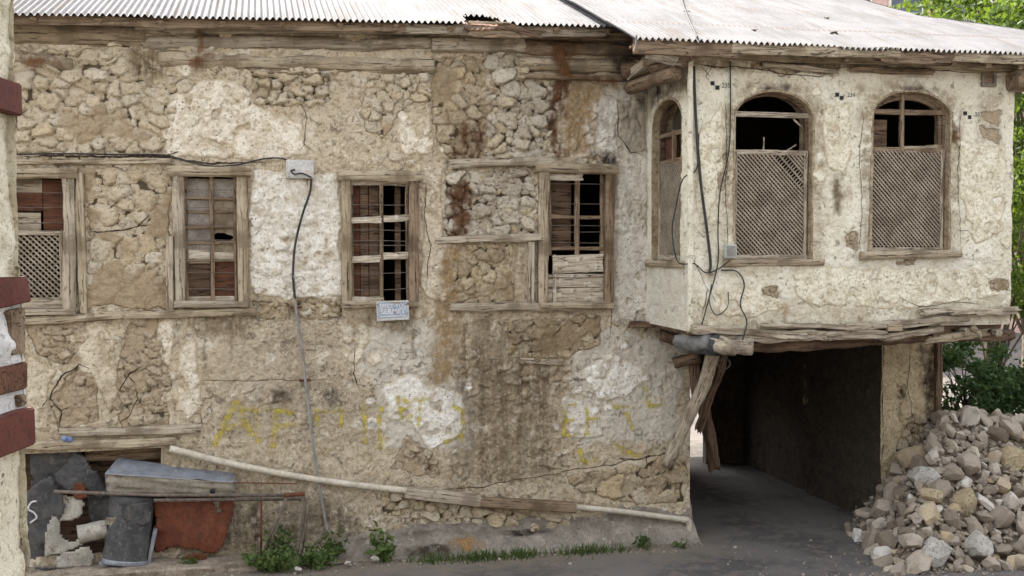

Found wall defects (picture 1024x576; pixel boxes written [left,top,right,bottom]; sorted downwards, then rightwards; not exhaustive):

rust [549,43,575,157]
spalling [13,46,386,453]
rust [447,180,472,236]
spalling [361,52,562,322]
peeling [952,110,1012,249]
crack [42,364,90,427]
crack [118,367,143,423]
peeling [365,374,473,478]
crack [446,451,683,489]
spalling [567,453,689,505]